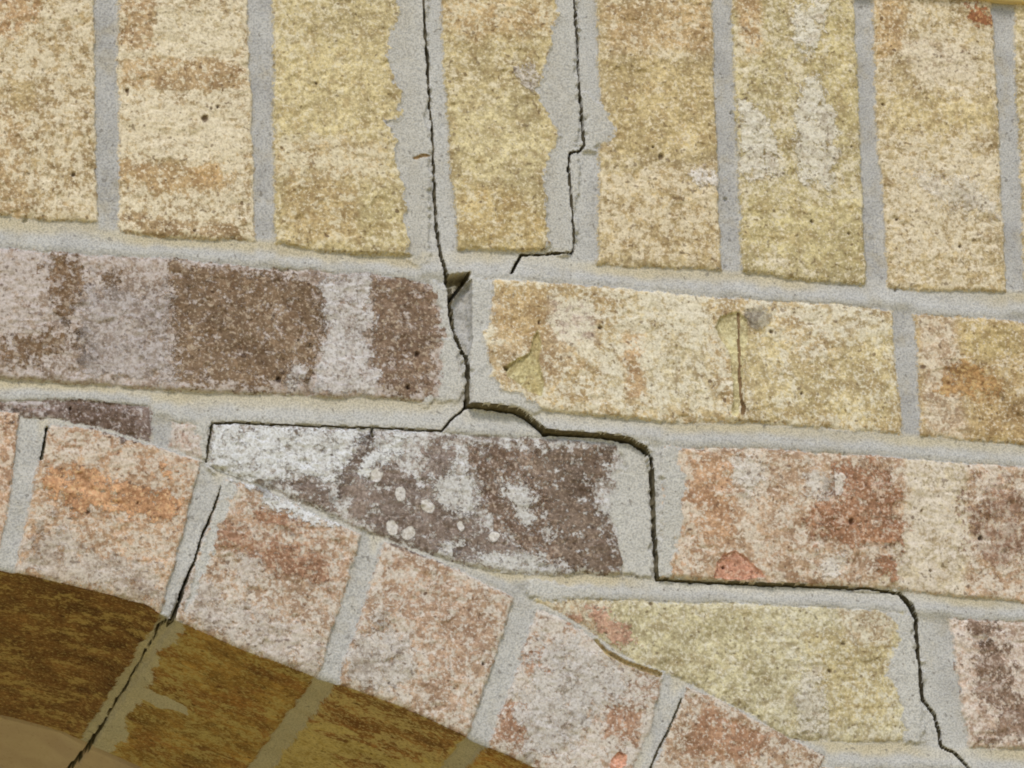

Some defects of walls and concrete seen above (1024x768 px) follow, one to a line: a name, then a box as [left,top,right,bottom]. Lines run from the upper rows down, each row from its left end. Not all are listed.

crack [67,488,220,768]
crack [205,0,970,768]